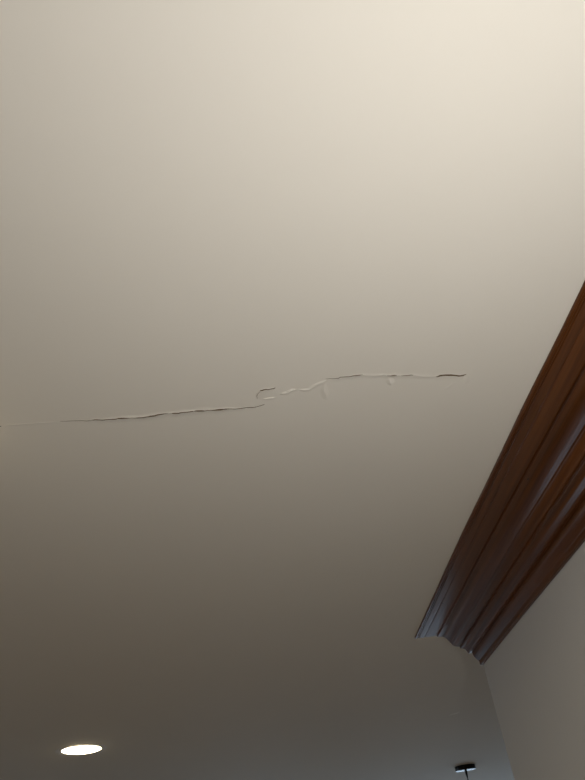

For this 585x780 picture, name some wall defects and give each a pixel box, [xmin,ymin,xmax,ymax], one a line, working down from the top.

crack [325,371,466,383]
crack [0,404,265,427]